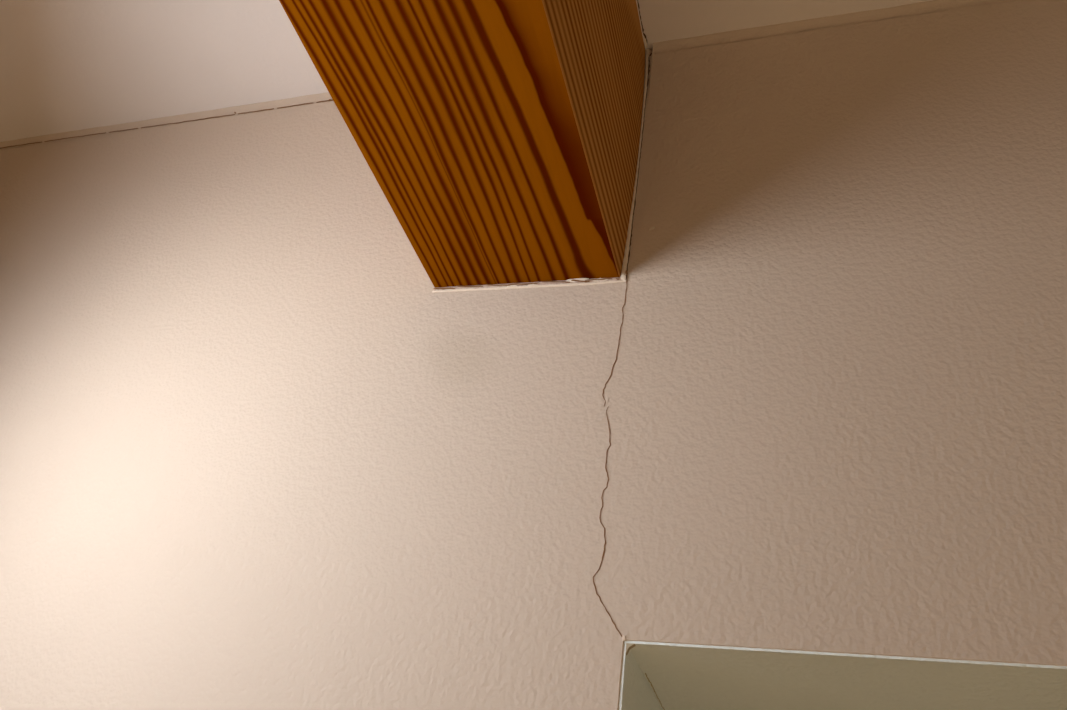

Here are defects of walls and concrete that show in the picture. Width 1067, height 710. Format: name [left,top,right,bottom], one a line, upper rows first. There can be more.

crack [593,0,652,637]